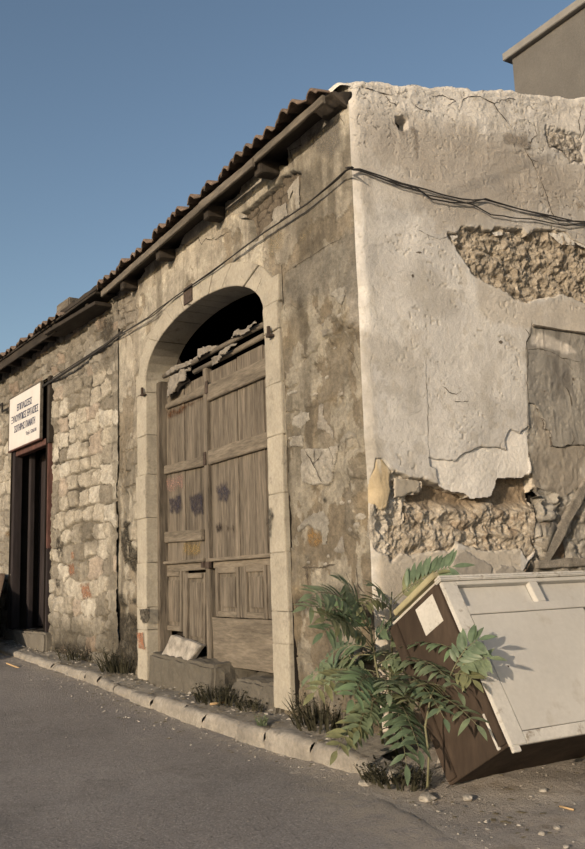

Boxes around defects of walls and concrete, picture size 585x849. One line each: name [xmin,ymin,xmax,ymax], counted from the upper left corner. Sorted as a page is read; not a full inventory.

crack [356,87,560,224]
spalling [545,130,582,163]
spalling [447,227,585,304]
crack [526,324,585,448]
spalling [366,404,585,572]